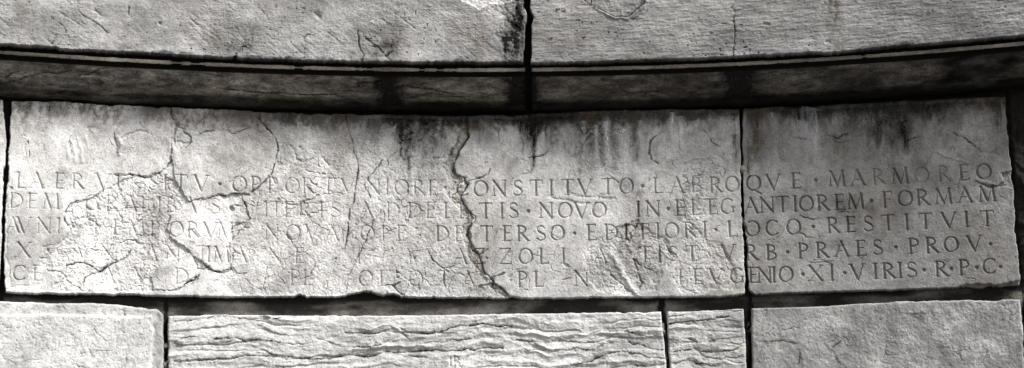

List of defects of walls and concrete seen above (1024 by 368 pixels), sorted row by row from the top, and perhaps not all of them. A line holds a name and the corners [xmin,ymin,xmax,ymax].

crack [115,107,190,178]
crack [228,89,346,173]
leakage [368,76,630,179]
leakage [770,101,963,146]
crack [431,178,508,295]